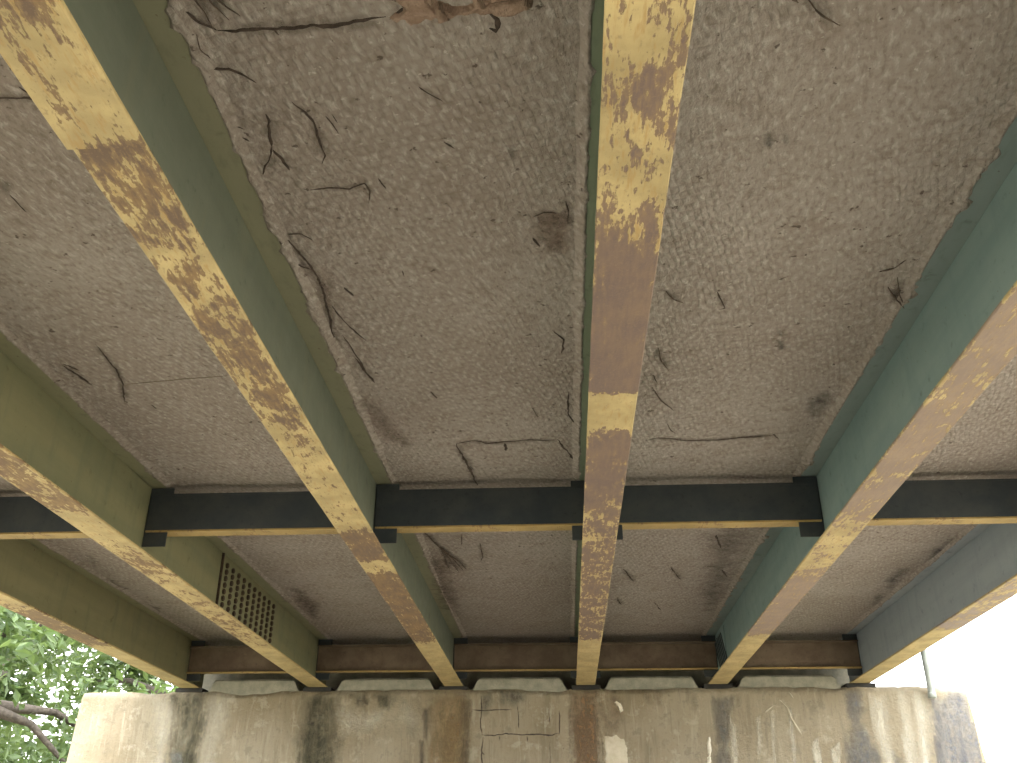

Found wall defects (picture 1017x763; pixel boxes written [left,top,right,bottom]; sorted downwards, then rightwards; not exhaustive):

crack [186,8,403,35]
spalling [390,0,533,26]
crack [489,14,501,33]
crack [0,87,32,100]
crack [214,67,256,83]
crack [238,114,290,174]
crack [292,102,386,200]
crack [532,201,569,247]
crack [288,233,370,378]
crack [456,392,574,485]
damp [299,696,332,763]